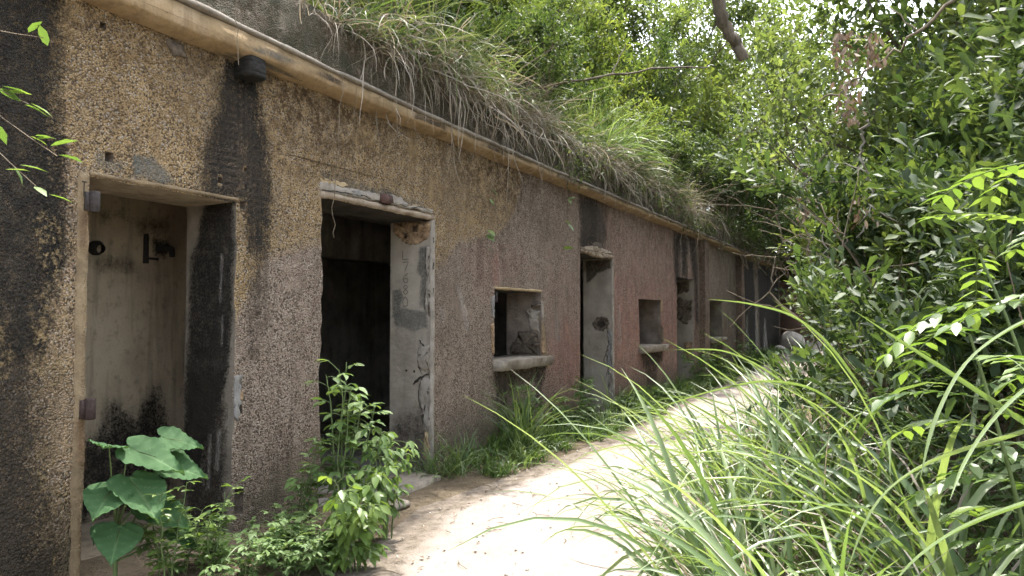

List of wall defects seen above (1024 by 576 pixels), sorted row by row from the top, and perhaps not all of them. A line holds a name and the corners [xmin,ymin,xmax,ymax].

water stain [0,0,71,576]
water stain [184,60,271,530]
spalling [320,178,431,317]
spalling [510,302,548,356]
flaking render [592,316,613,394]
water stain [82,387,170,524]